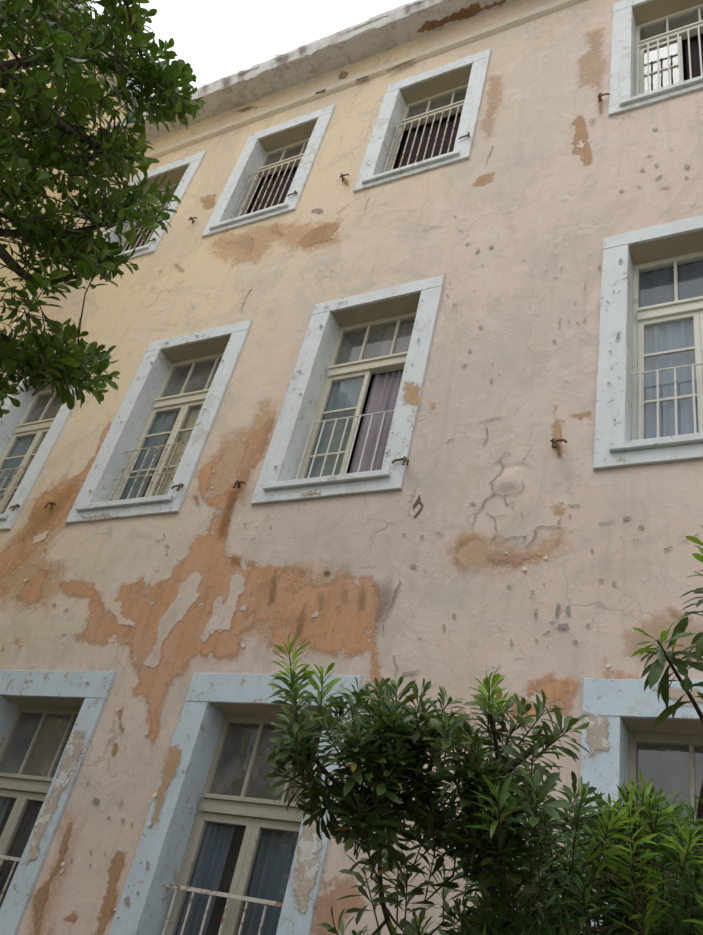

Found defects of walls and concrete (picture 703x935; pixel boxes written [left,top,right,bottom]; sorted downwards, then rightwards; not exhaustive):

spalling [417,0,506,33]
flaking render [570,115,592,165]
flaking render [213,208,339,264]
crack [471,417,580,547]
flaking render [0,402,381,744]
flaking render [508,673,578,725]
flaking render [580,711,611,755]
flaking render [669,687,703,707]
flaking render [25,724,86,864]
flaking render [147,745,181,826]
flaking render [89,844,139,935]
flaking render [291,797,364,935]